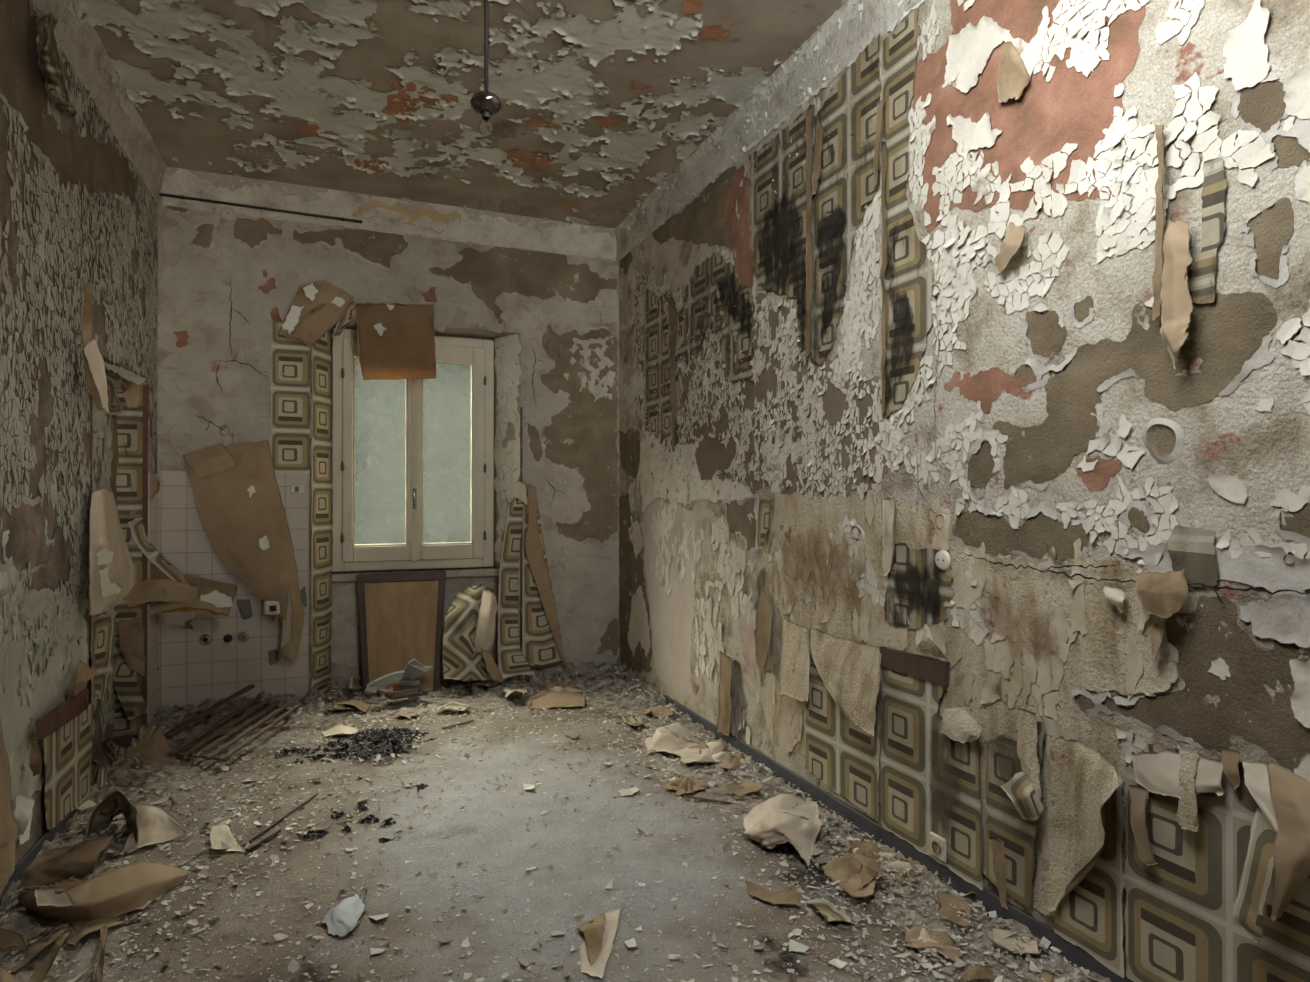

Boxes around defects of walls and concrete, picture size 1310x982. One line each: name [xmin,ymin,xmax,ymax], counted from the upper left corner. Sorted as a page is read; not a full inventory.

peeling [877,0,1149,93]
peeling [64,0,863,265]
peeling [908,93,936,209]
crack [216,278,269,389]
mould [717,272,753,354]
mould [758,193,846,345]
mould [885,225,914,406]
peeling [984,228,1070,315]
spalling [1241,198,1294,288]
mould [894,565,940,618]
crack [957,552,1136,583]
crack [1187,583,1310,605]